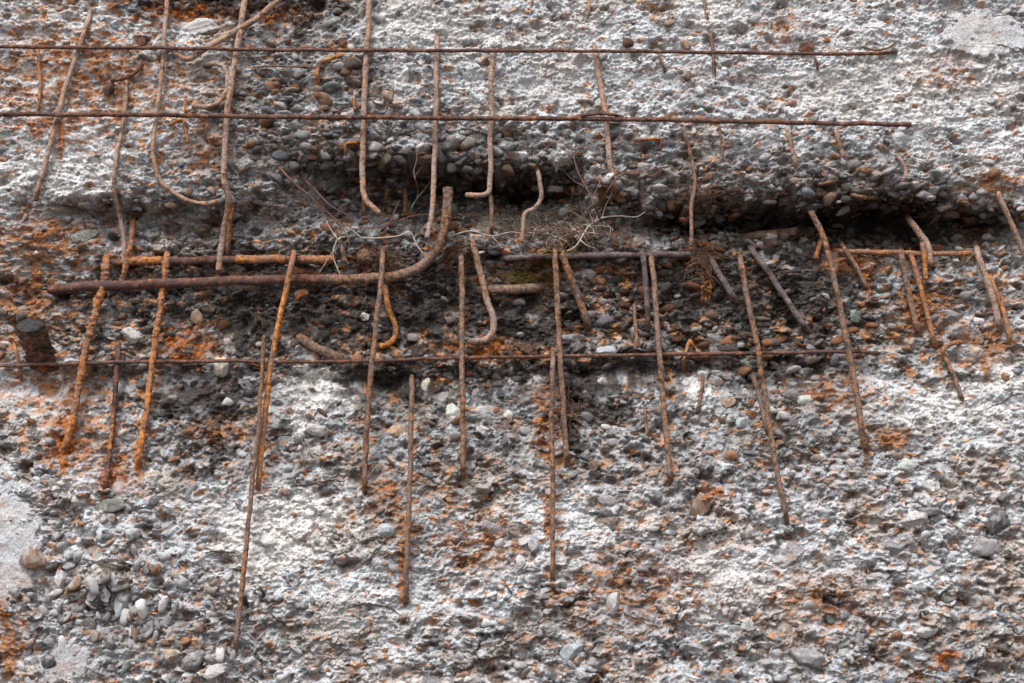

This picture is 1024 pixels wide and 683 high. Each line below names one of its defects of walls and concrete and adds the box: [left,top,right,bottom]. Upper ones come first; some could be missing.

rust [145,3,223,22]
rust [8,37,197,160]
rust [84,225,135,338]
rust [152,250,213,360]
rust [11,368,111,471]
rust [100,411,141,500]
rust [531,375,557,464]
rust [805,380,869,411]
rust [369,473,406,605]
rust [435,513,517,578]
rust [577,560,711,625]
rust [768,575,868,621]